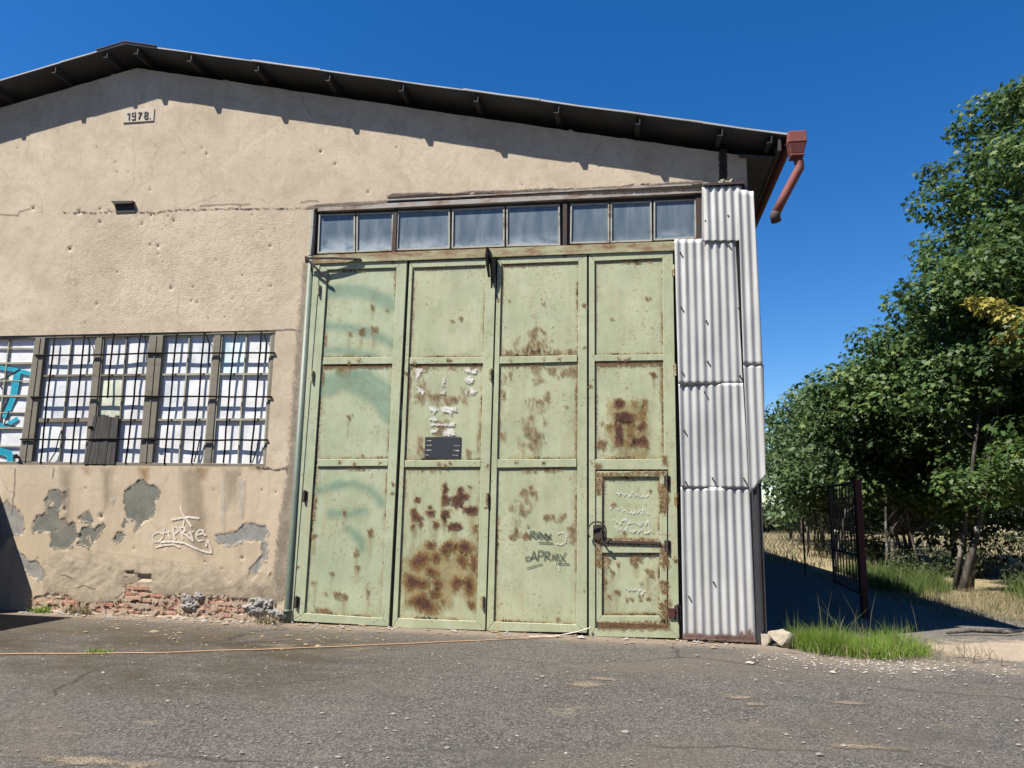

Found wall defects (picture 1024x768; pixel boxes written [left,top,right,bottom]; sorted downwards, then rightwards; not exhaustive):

crack [140,200,318,214]
rust [482,263,544,331]
rust [404,355,481,406]
flaking render [0,260,308,622]
rust [495,314,679,631]
rust [320,429,489,620]
rust [311,580,369,617]